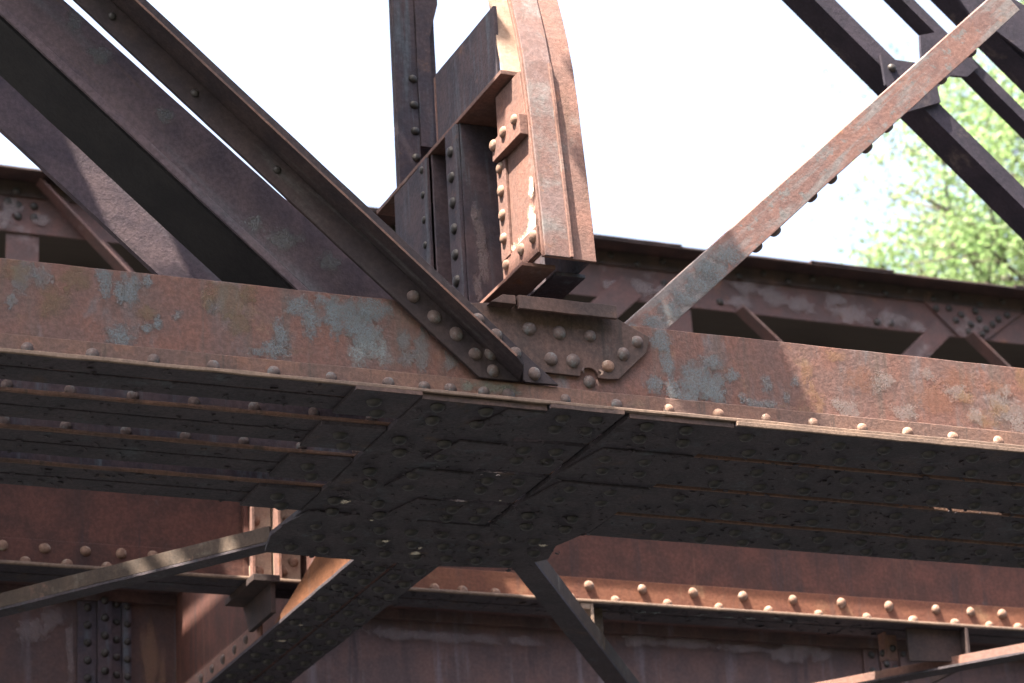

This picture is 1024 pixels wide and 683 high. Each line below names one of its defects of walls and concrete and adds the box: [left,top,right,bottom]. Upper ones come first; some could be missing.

peeling [94,269,153,307]
peeling [248,293,428,371]
peeling [631,242,926,407]